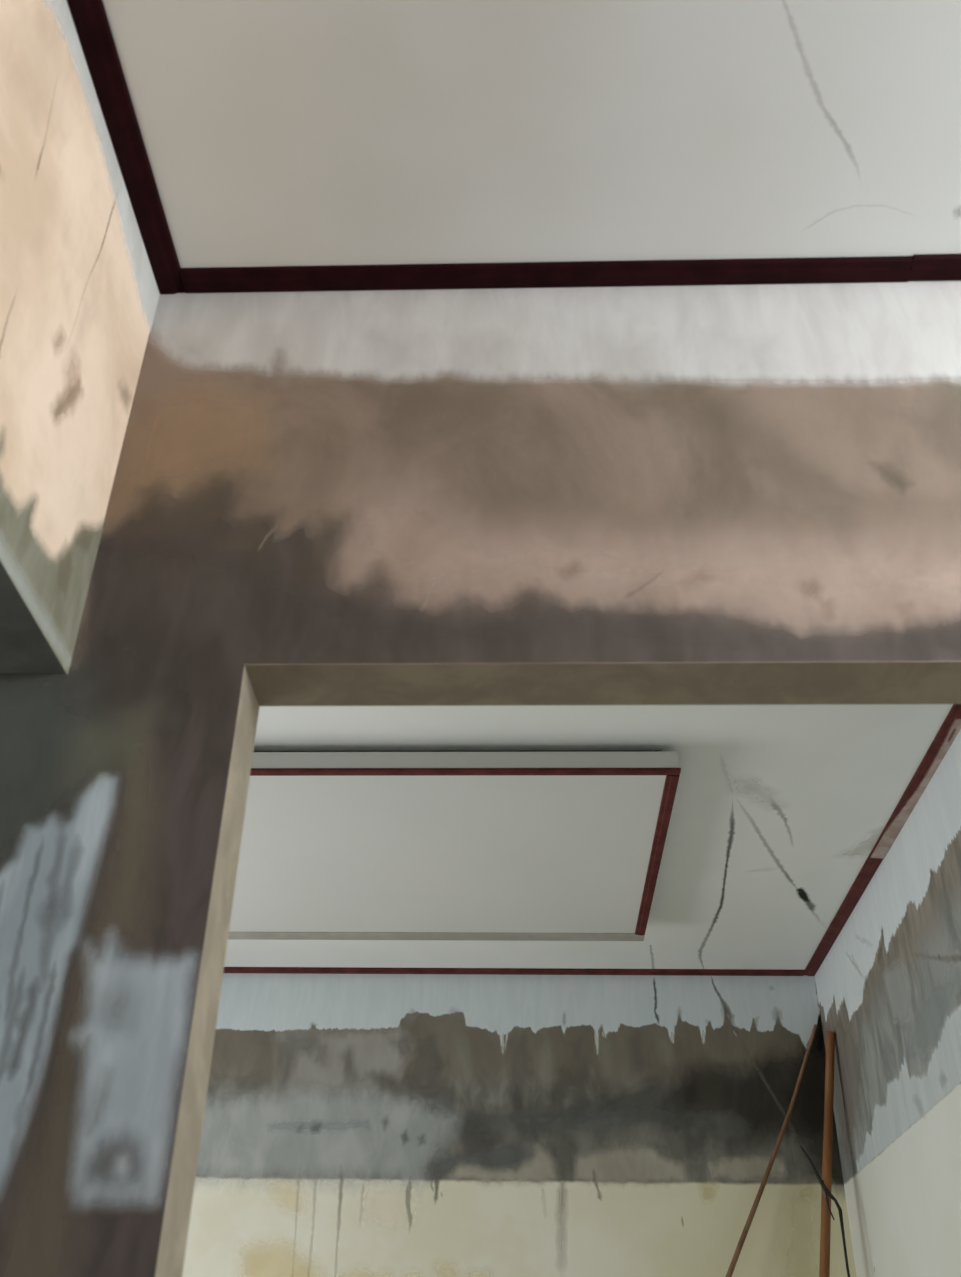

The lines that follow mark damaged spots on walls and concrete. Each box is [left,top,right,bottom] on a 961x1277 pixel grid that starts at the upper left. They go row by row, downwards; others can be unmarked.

water stain [0,391,961,1277]
crack [699,782,815,1026]